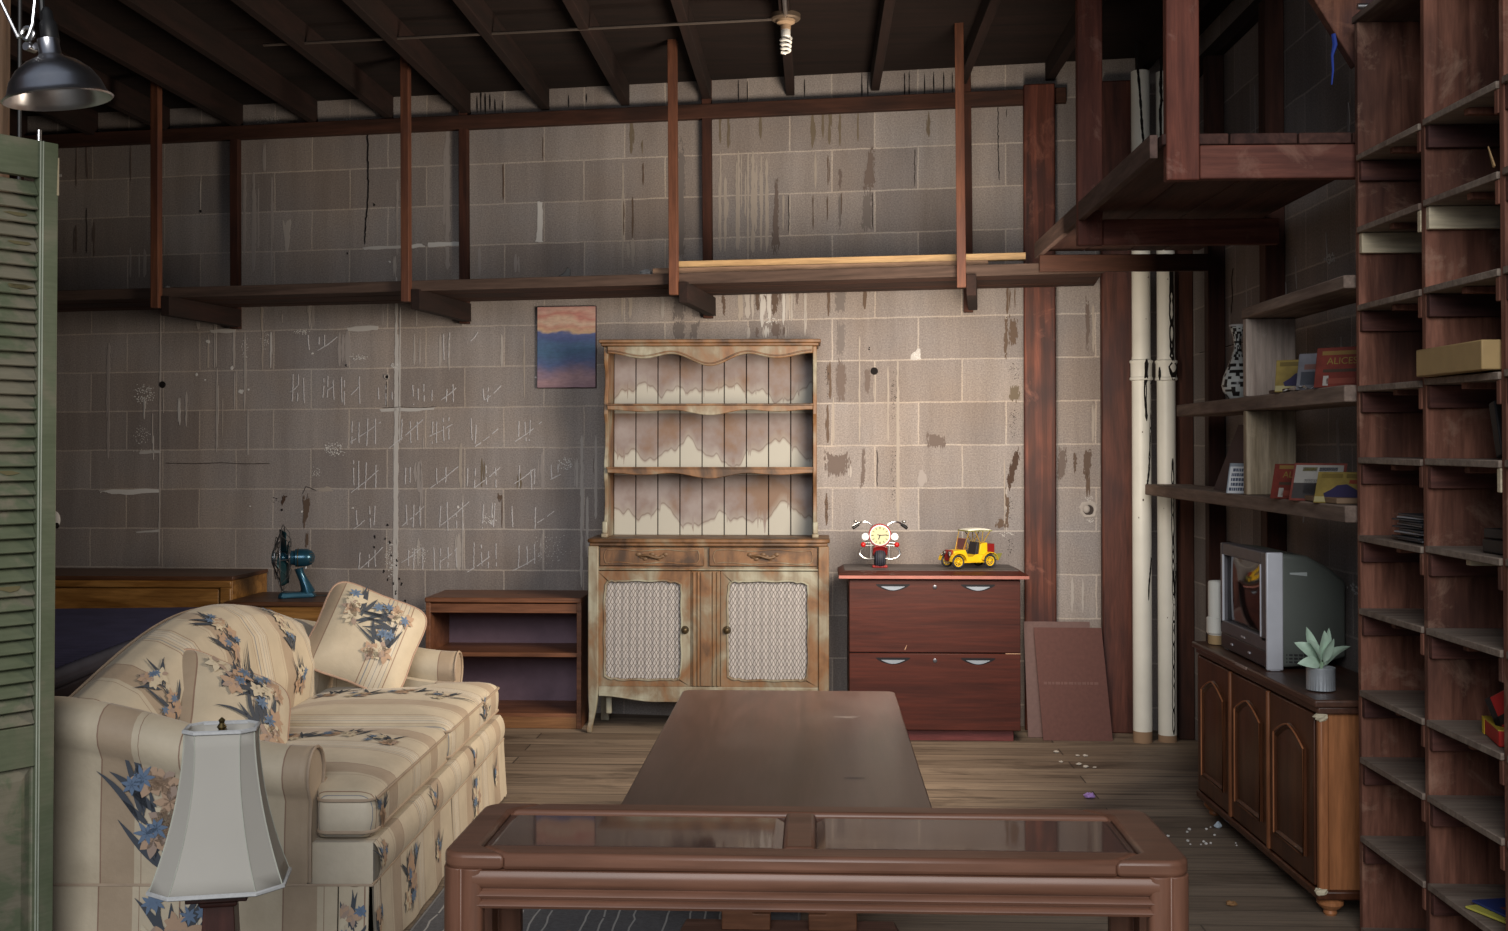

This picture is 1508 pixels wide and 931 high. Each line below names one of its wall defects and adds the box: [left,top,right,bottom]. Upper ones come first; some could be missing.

damp [718,151,785,255]
damp [861,147,876,232]
damp [1057,405,1096,523]